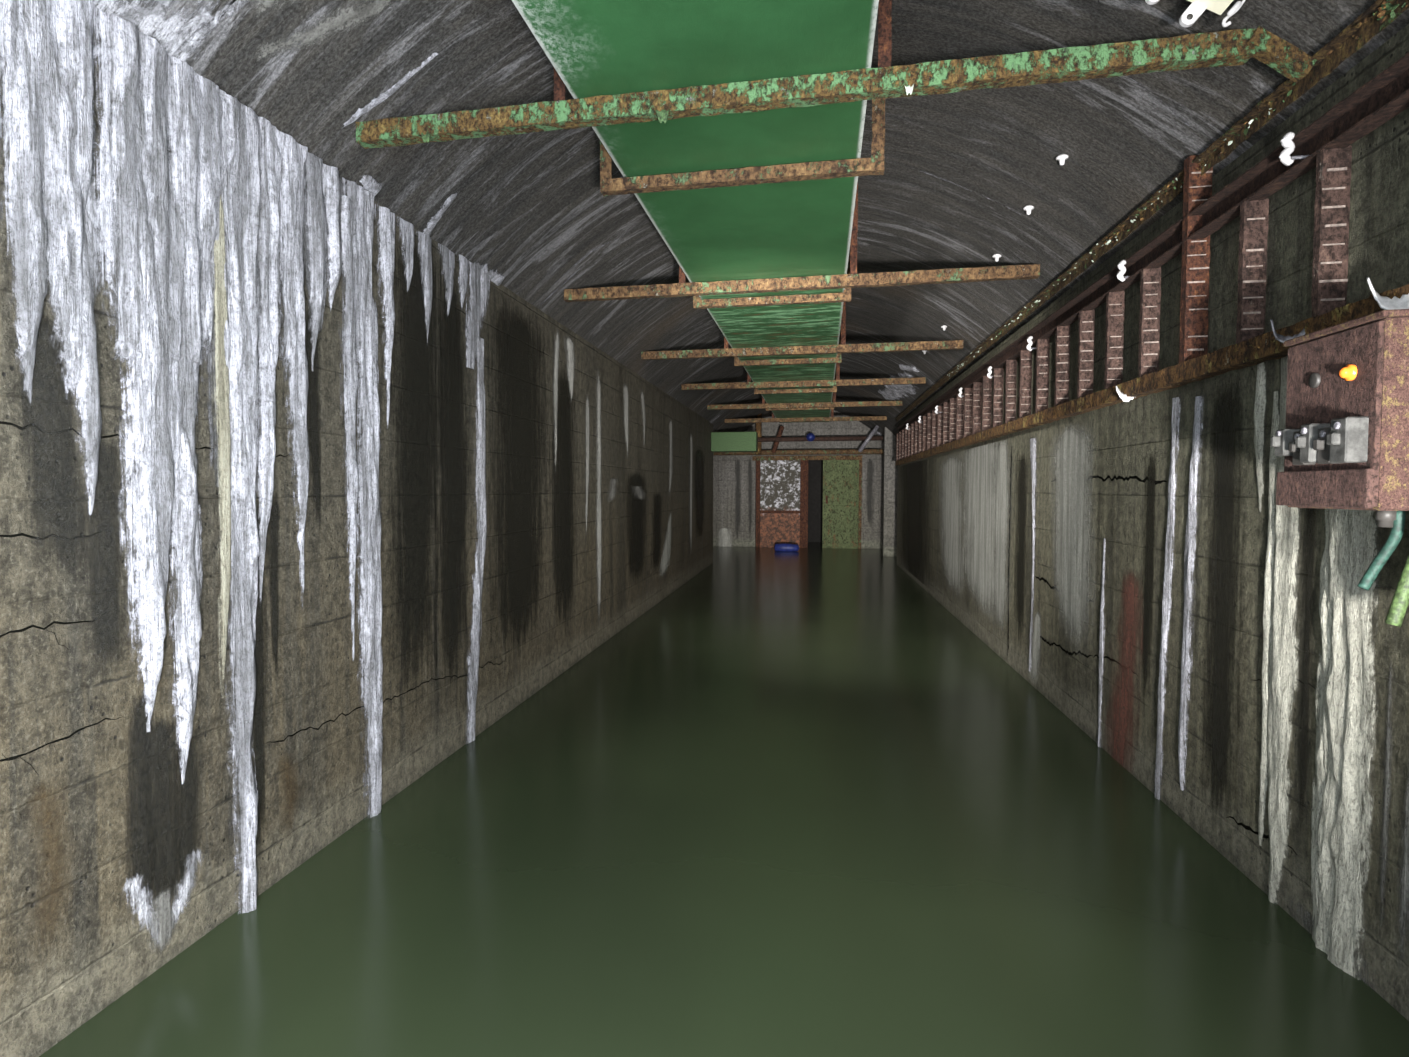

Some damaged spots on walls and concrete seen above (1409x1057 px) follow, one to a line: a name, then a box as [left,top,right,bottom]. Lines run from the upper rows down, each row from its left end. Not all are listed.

crack [0,532,90,540]
crack [0,611,120,650]
damp [0,0,673,950]
damp [690,435,704,542]
damp [718,460,752,547]
damp [902,438,1040,680]
damp [1055,428,1106,748]
damp [1143,356,1409,990]
crack [0,716,123,774]